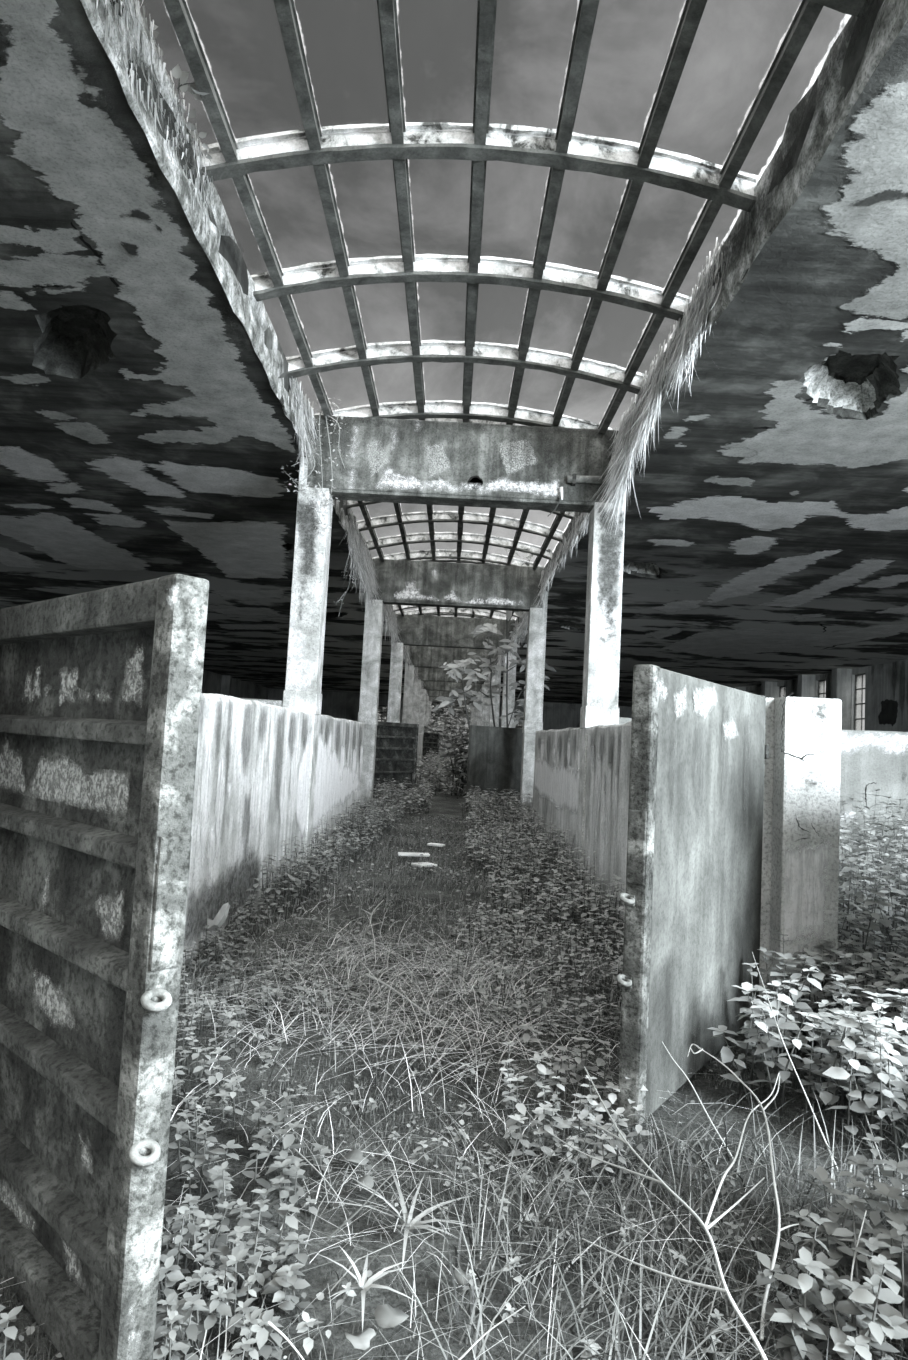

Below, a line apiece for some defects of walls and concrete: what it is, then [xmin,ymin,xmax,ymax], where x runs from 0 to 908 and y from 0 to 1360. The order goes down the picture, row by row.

flaking render [0,0,296,453]
flaking render [646,82,908,658]
flaking render [0,410,294,630]
spalling [623,561,668,579]
leakage [201,699,363,876]
leakage [535,735,619,842]